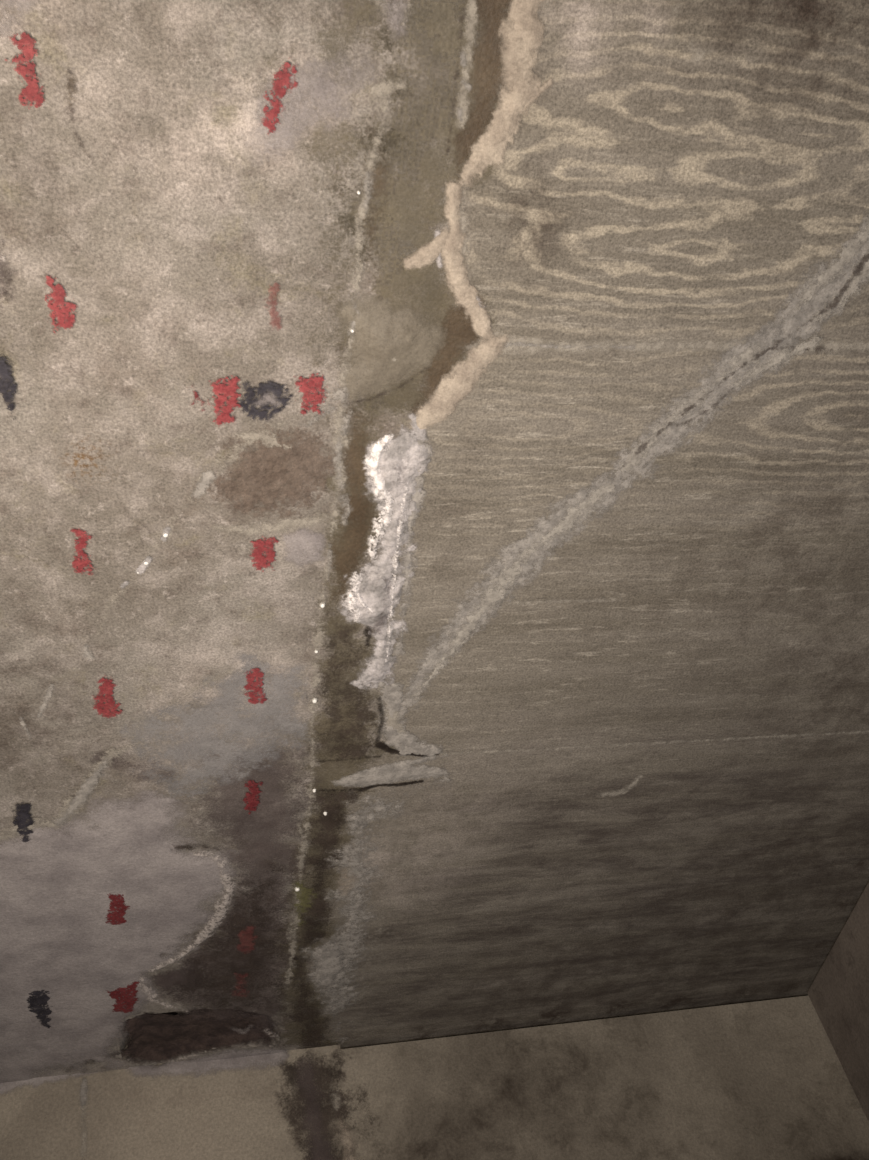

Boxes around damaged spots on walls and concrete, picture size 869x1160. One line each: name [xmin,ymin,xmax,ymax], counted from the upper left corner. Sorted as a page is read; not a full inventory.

crack [456,0,477,128]
peeling [0,791,288,1094]
damp [122,0,552,1160]
crack [193,138,869,984]